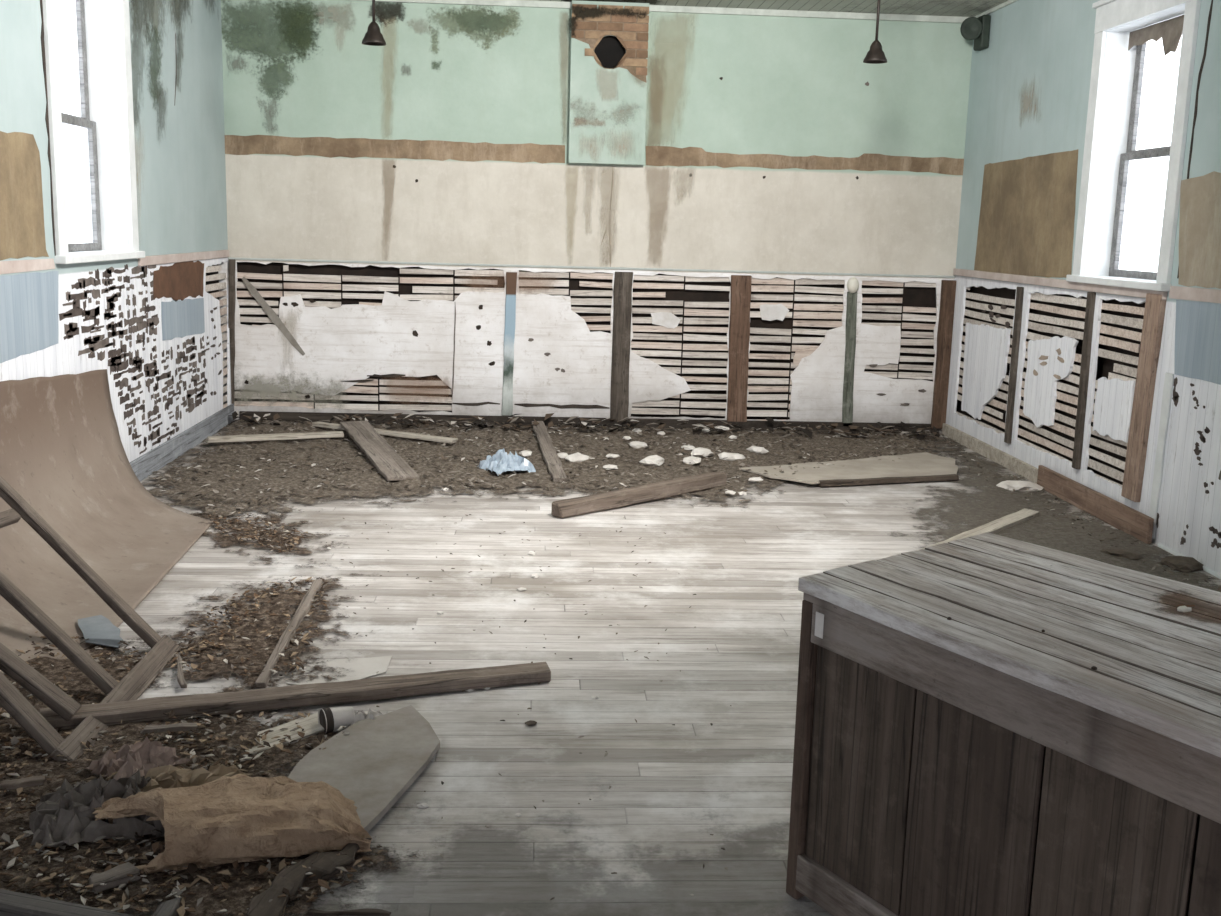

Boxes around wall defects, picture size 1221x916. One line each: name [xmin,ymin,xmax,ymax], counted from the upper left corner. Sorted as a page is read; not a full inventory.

water stain [131,0,189,127]
water stain [209,0,348,131]
water stain [369,1,404,27]
water stain [432,8,518,69]
spalling [571,4,649,83]
flaking render [646,146,964,179]
spalling [59,261,613,454]
spalling [631,274,731,419]
spalling [747,277,845,421]
spalling [861,280,936,393]
flaking render [956,149,1145,487]
peeling [1172,377,1205,409]